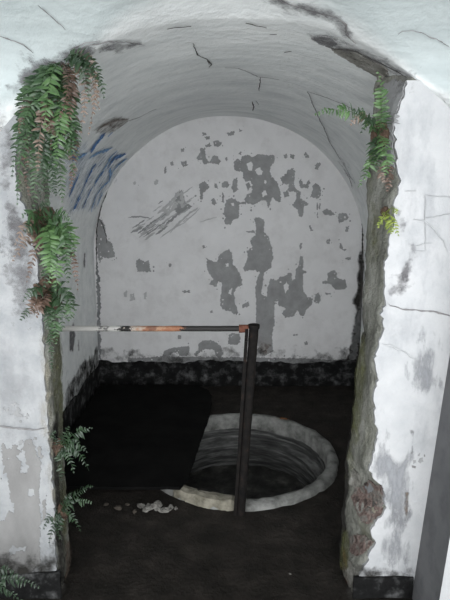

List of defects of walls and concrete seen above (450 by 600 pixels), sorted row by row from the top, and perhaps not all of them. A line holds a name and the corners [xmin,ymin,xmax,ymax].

crack [236,68,278,110]
crack [307,91,352,186]
peeling [174,132,351,232]
peeling [204,217,347,364]
crack [390,305,450,316]
peeling [128,335,243,363]
water stain [416,354,431,389]
peeling [0,437,47,571]
spalling [348,468,385,524]